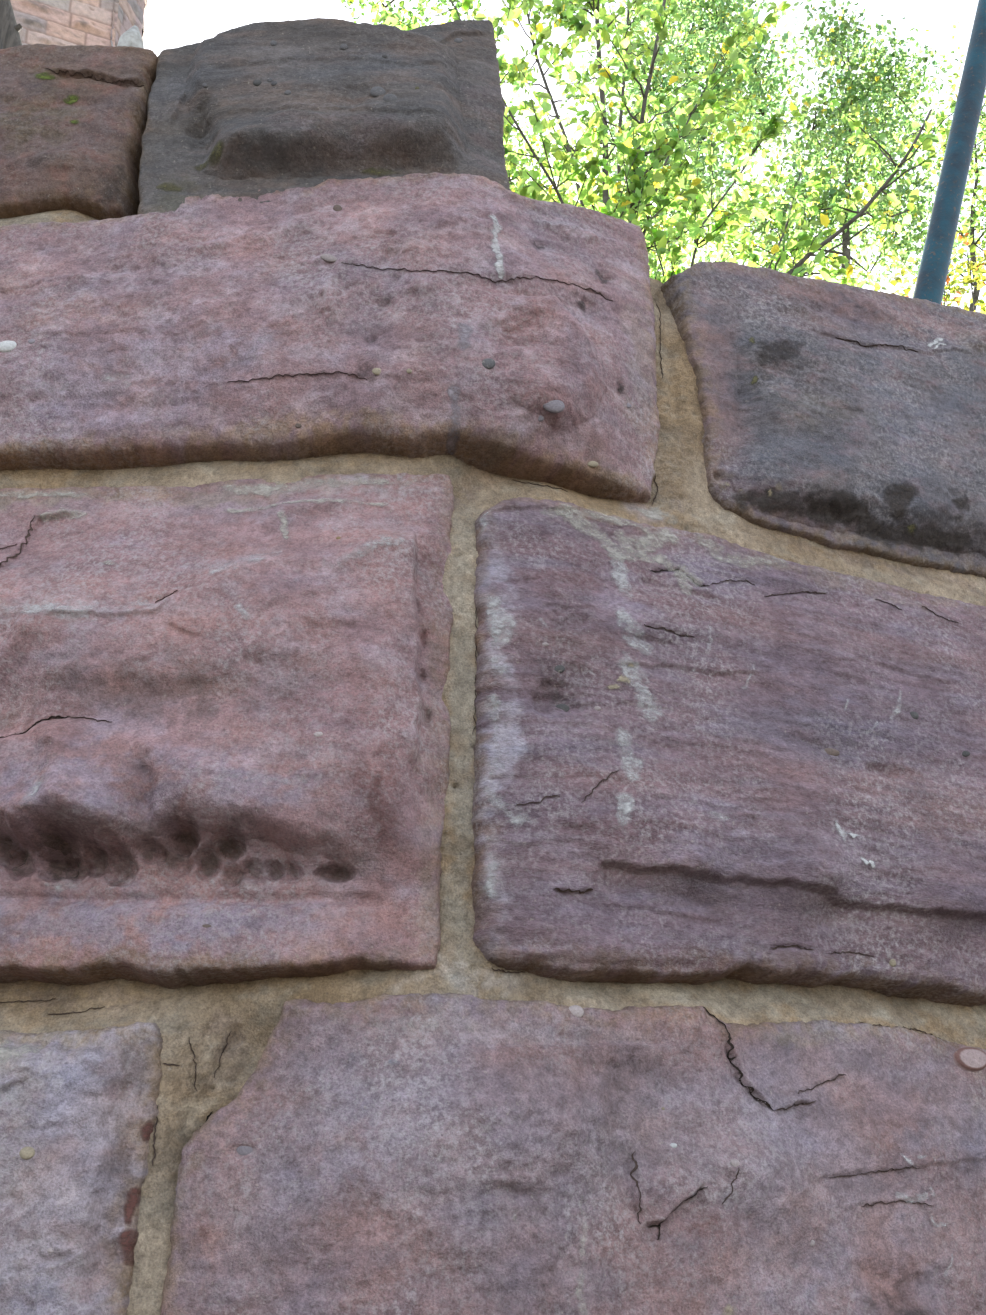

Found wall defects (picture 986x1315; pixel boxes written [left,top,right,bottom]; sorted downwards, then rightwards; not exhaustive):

crack [0,516,35,565]
crack [0,715,110,738]
crack [704,1007,845,1111]
crack [630,1153,740,1240]